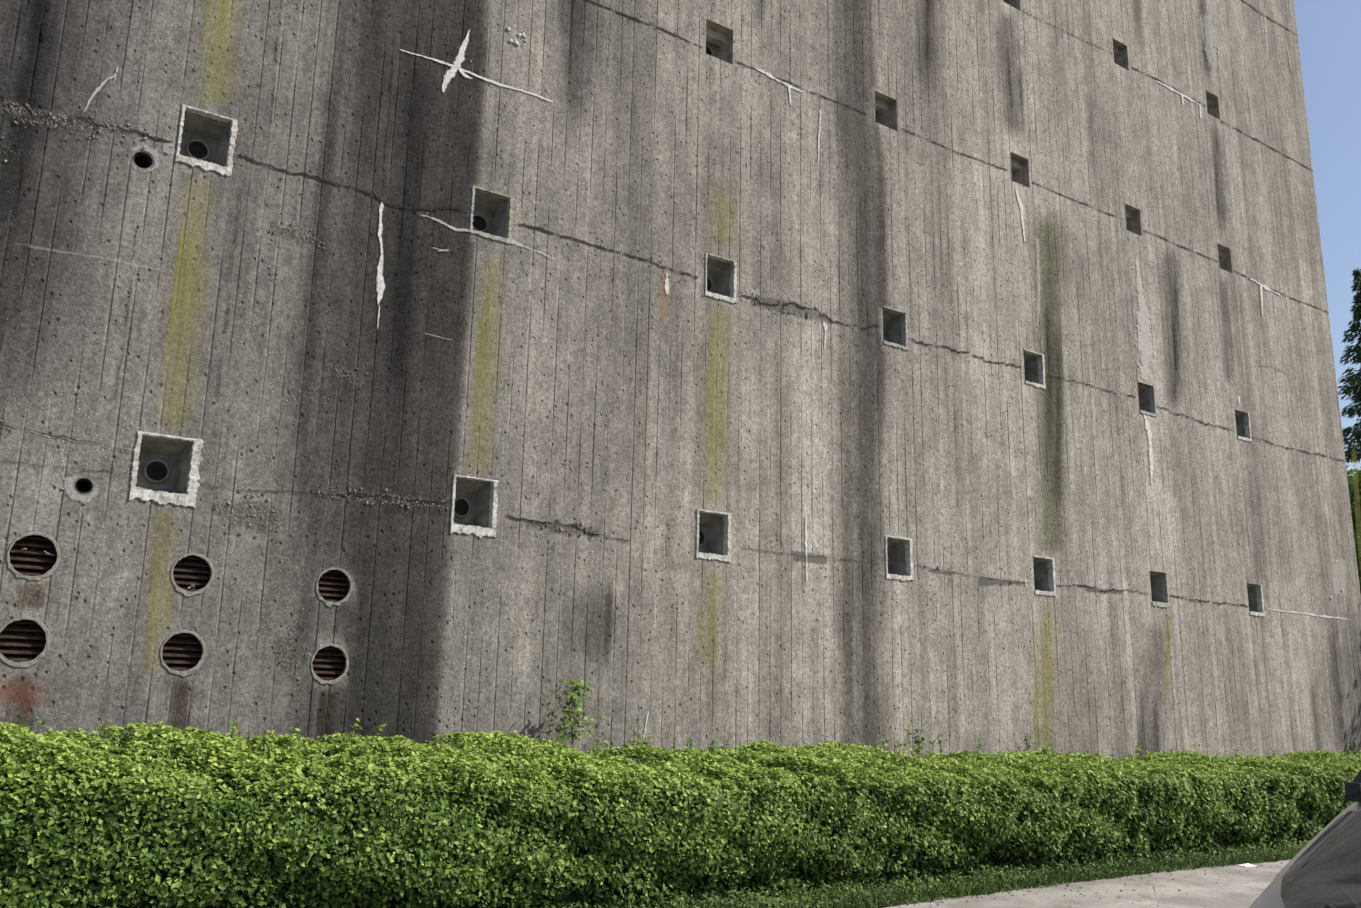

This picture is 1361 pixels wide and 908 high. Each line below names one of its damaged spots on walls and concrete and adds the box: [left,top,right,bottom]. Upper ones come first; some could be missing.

crack [576,0,703,48]
crack [0,88,173,145]
leakage [400,30,554,102]
crack [737,61,866,114]
crack [215,0,468,400]
leakage [377,202,385,330]
crack [517,223,699,278]
crack [901,128,1329,313]
crack [115,228,138,397]
crack [740,295,1351,463]
crack [0,425,131,474]
crack [503,514,630,543]